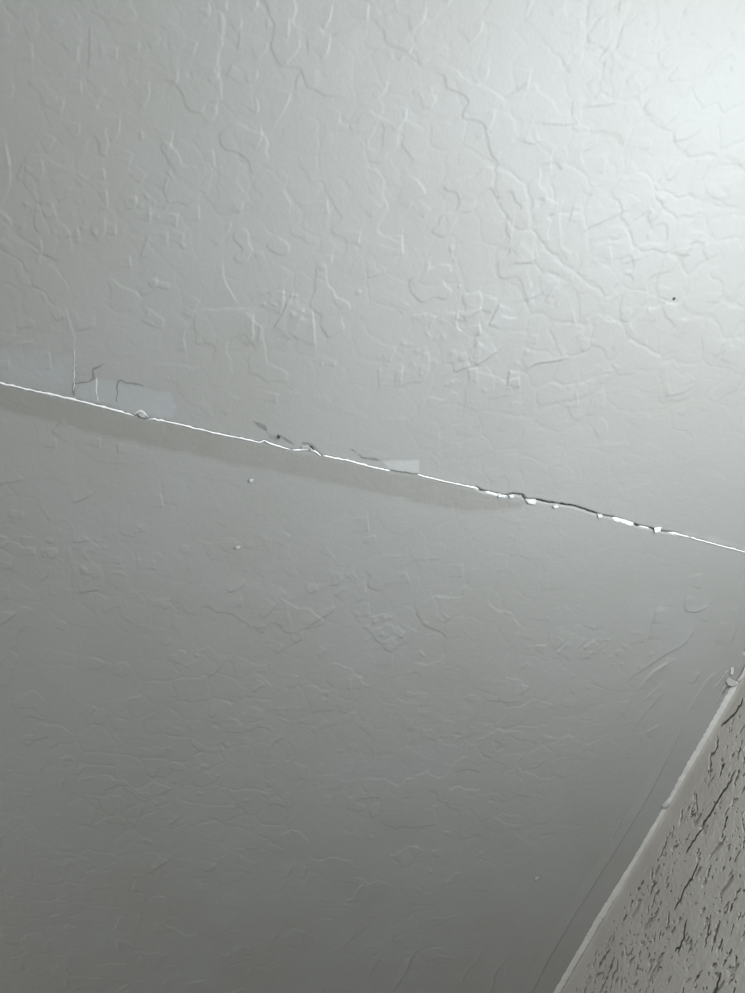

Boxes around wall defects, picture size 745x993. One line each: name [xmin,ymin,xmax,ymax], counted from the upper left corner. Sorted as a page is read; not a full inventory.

crack [0,348,745,552]